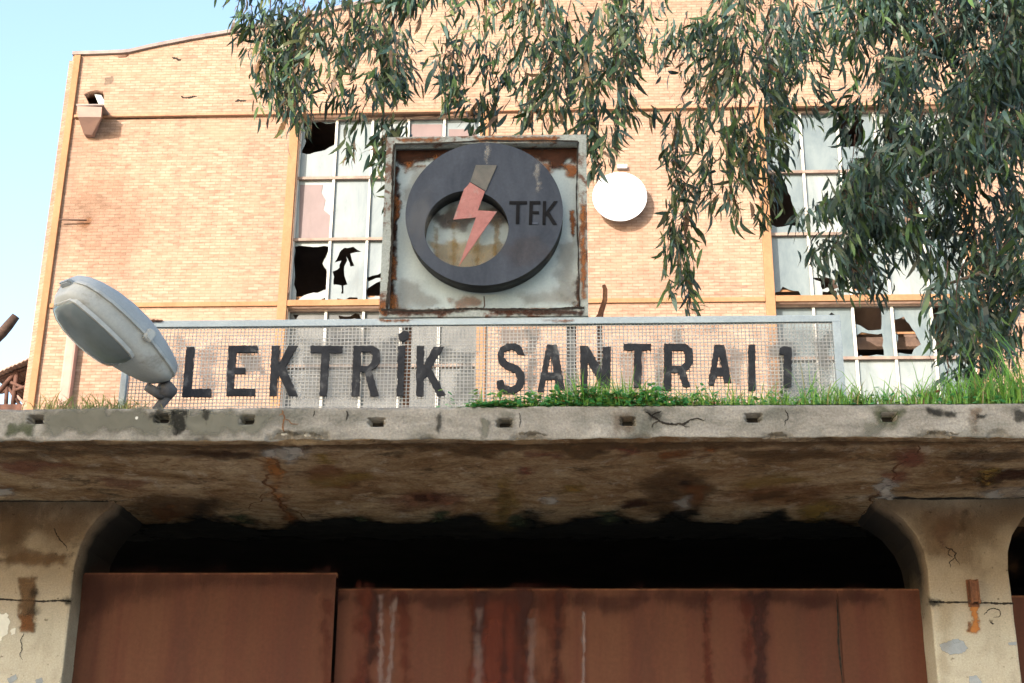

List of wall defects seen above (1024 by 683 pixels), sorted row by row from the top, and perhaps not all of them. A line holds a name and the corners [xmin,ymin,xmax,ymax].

water stain [0,407,1024,461]
crack [646,411,704,427]
water stain [134,496,220,521]
crack [249,456,306,524]
corrosion [0,553,66,632]
peeling [0,613,16,641]
corrosion [353,589,379,683]
corrosion [468,588,534,683]
peeling [940,639,968,655]
corrosion [967,607,980,633]